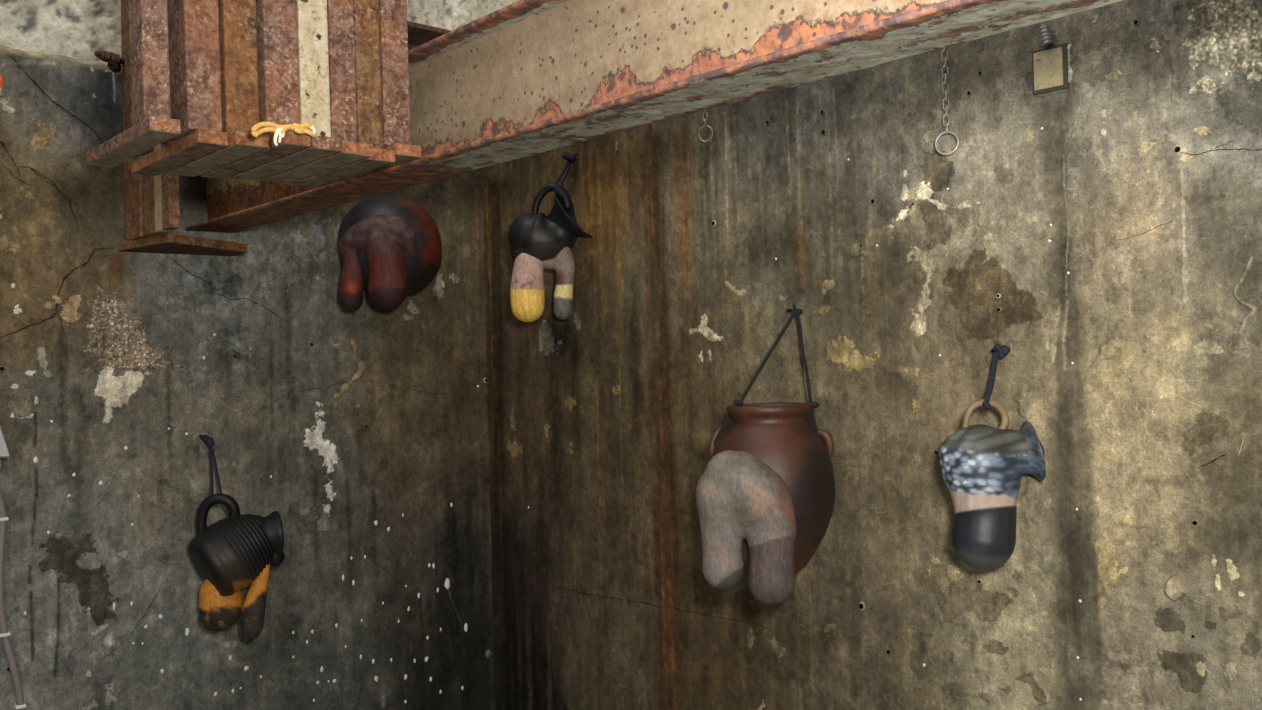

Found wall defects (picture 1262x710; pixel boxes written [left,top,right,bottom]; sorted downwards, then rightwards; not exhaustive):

crack [8,55,103,143]
peeling [1137,137,1193,174]
flaking render [1142,0,1262,136]
crack [0,141,107,338]
peeling [40,215,342,423]
peeling [689,314,723,362]
peeling [824,336,881,373]
damp [406,182,567,710]